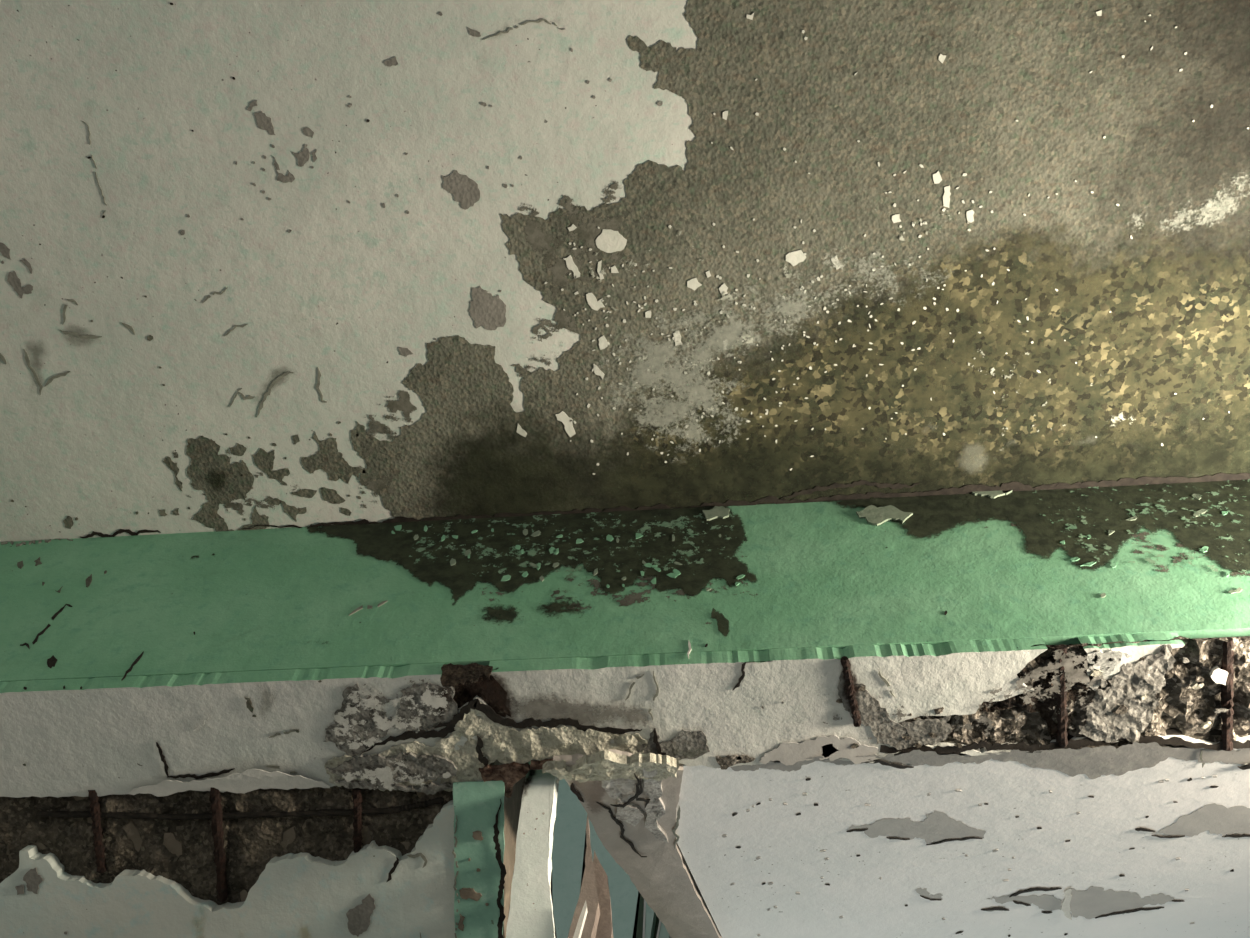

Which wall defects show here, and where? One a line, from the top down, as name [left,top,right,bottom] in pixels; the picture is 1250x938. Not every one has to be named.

damp [1161,0,1250,278]
peeling [0,242,33,299]
peeling [159,0,1250,532]
damp [307,250,1250,626]
peeling [63,516,78,529]
peeling [711,608,729,636]
corrosion [438,674,514,719]
crack [878,671,896,698]
corrosion [978,644,1176,745]
spalling [0,636,1250,906]
crack [570,783,680,857]
peeling [981,857,1189,935]